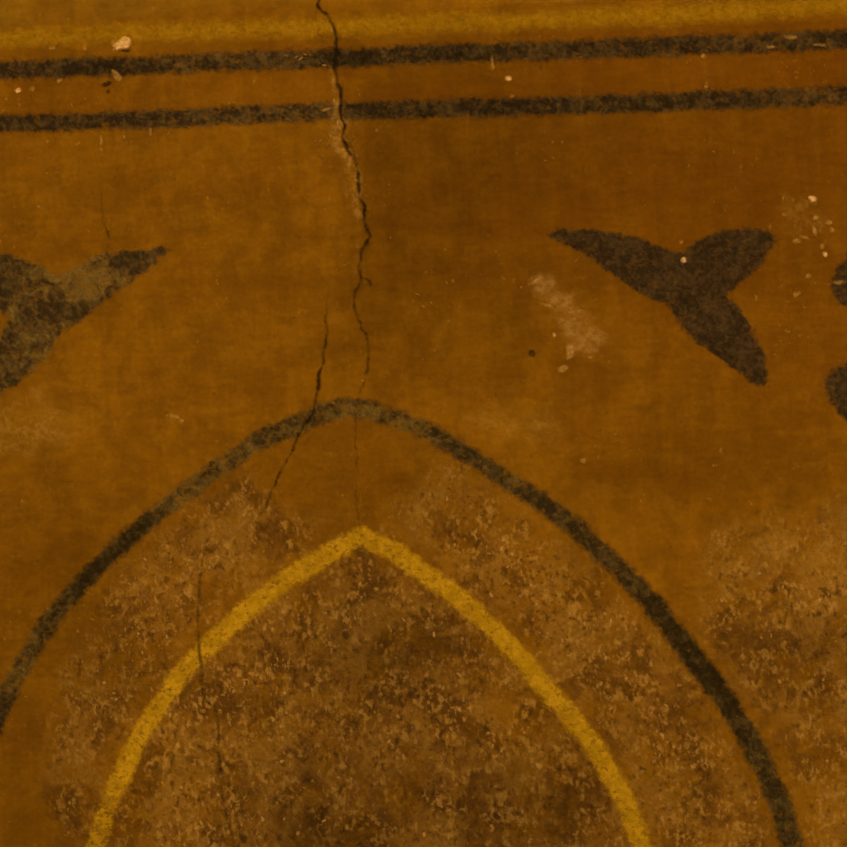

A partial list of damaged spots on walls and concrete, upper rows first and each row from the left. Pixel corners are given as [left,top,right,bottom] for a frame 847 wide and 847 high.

crack [284,0,370,244]
crack [275,336,327,486]